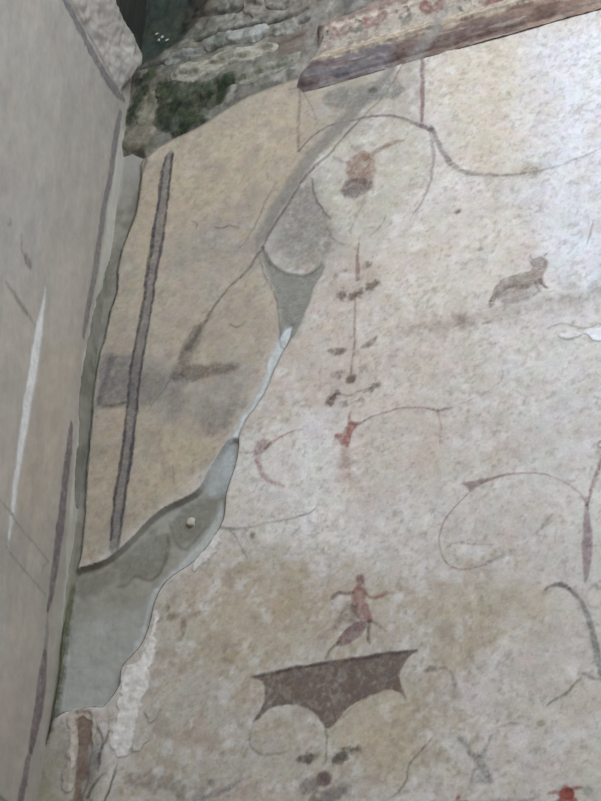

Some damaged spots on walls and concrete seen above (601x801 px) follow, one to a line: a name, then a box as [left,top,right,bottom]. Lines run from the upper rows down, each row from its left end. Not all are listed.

flaking render [46,0,380,792]
flaking render [559,328,601,341]